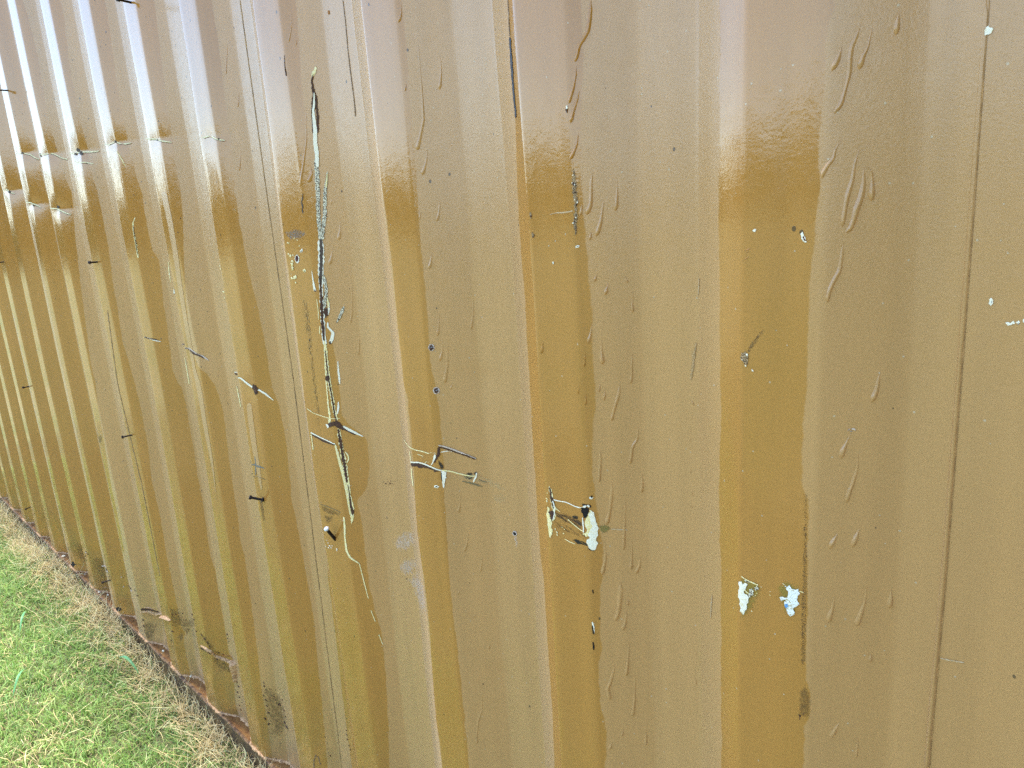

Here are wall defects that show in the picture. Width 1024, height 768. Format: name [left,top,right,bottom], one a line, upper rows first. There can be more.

peeling [327,306,344,344]
spalling [404,440,497,488]
peeling [546,486,598,551]
peeling [738,576,759,615]
peeling [779,583,803,616]